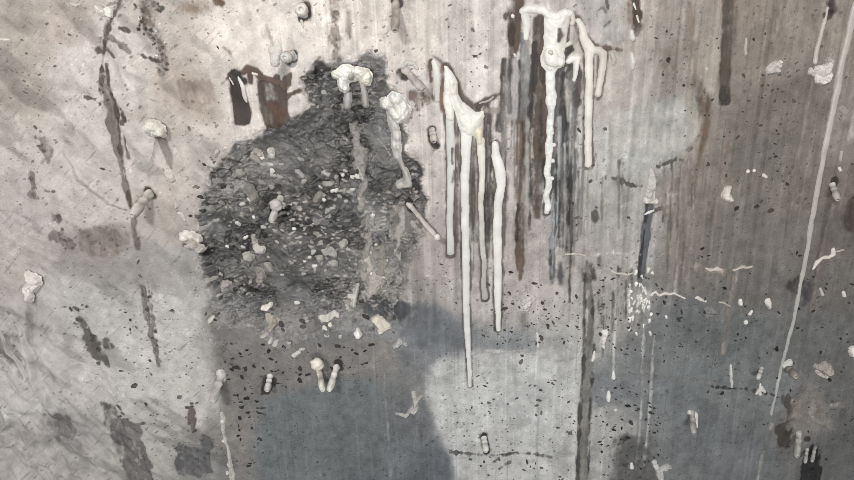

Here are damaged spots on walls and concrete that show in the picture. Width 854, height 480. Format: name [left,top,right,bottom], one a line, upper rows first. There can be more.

spalling [179,0,432,448]
water stain [470,13,624,302]
water stain [631,156,694,295]
water stain [719,0,733,105]